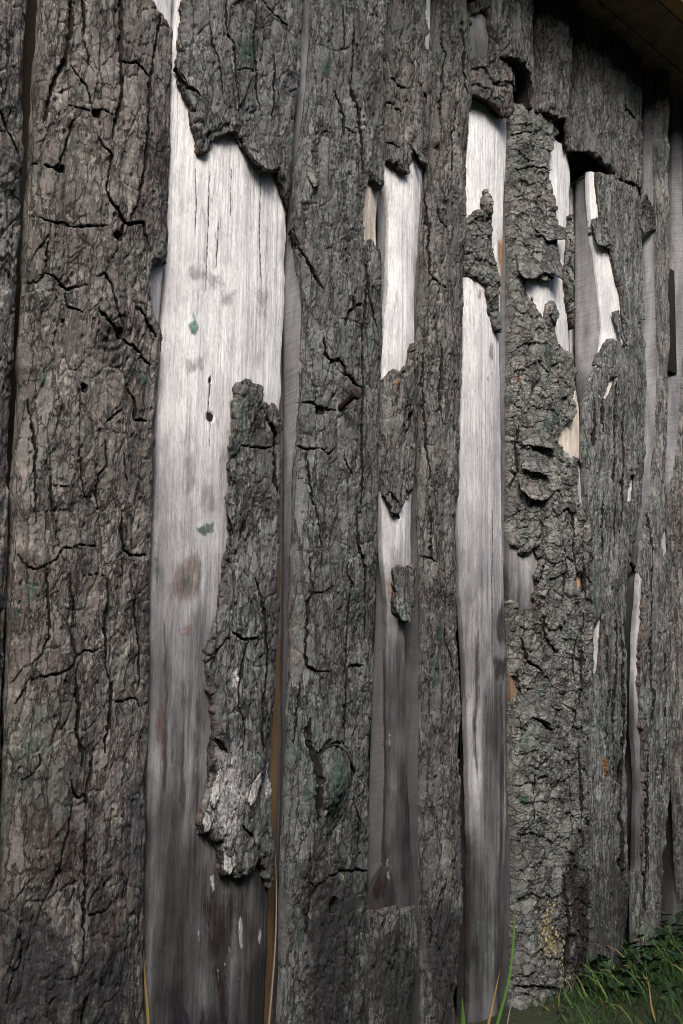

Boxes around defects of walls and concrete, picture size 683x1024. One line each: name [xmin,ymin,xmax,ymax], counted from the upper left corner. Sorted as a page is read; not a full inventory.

crack [0,0,288,365]
crack [289,227,324,289]
peeling [362,139,427,380]
peeling [585,171,628,353]
damp [163,654,198,825]
peeling [142,0,286,1024]
crack [241,260,378,933]
peeling [365,491,413,910]
peeling [455,100,552,1024]
damp [172,875,243,1024]